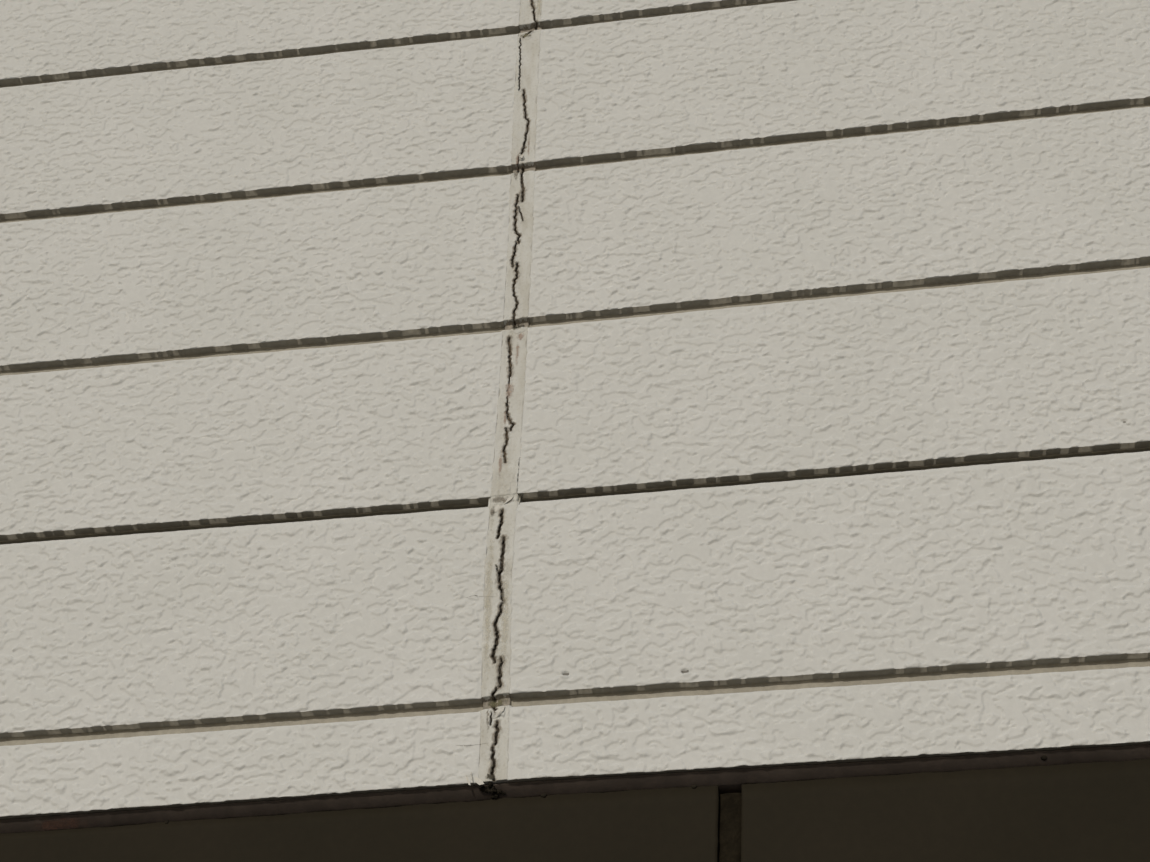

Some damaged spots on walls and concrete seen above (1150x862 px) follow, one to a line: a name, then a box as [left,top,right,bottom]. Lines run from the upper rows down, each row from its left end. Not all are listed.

crack [503,0,538,476]
crack [460,509,506,781]